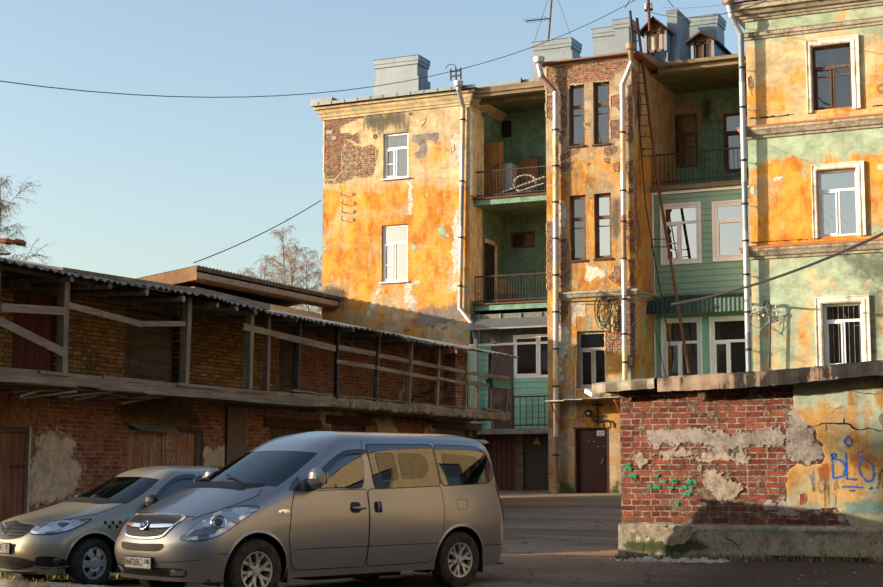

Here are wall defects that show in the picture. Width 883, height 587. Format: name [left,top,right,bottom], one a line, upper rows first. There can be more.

spalling [323,116,379,185]
spalling [544,58,642,291]
peeling [559,299,588,328]
peeling [643,405,824,465]
crack [817,388,883,432]
peeling [762,493,851,527]